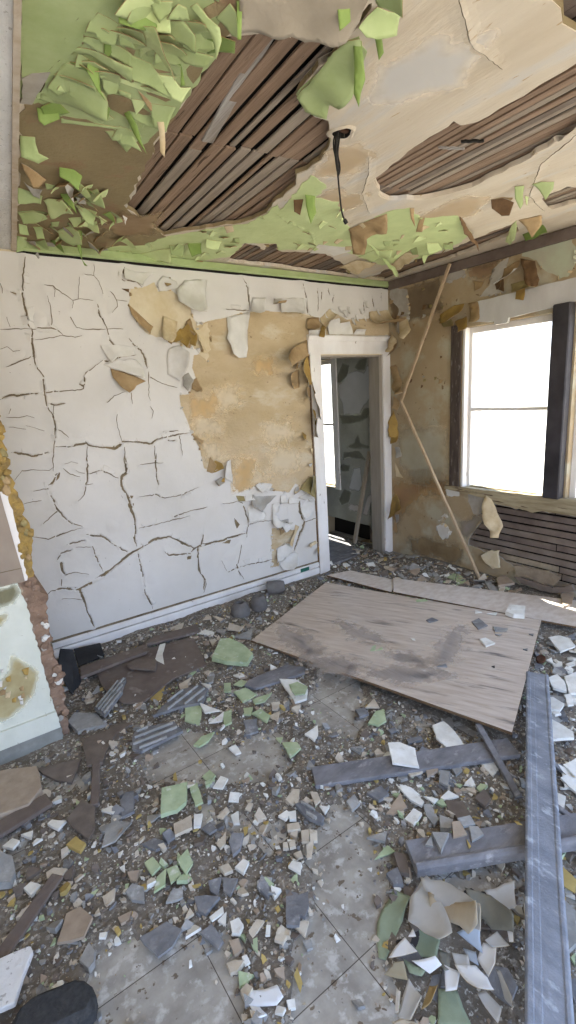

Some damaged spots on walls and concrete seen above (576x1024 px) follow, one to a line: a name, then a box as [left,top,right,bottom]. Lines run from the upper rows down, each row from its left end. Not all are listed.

crack [0,257,316,626]
flaking render [16,0,576,570]
crack [301,284,334,316]
flaking render [468,504,576,593]